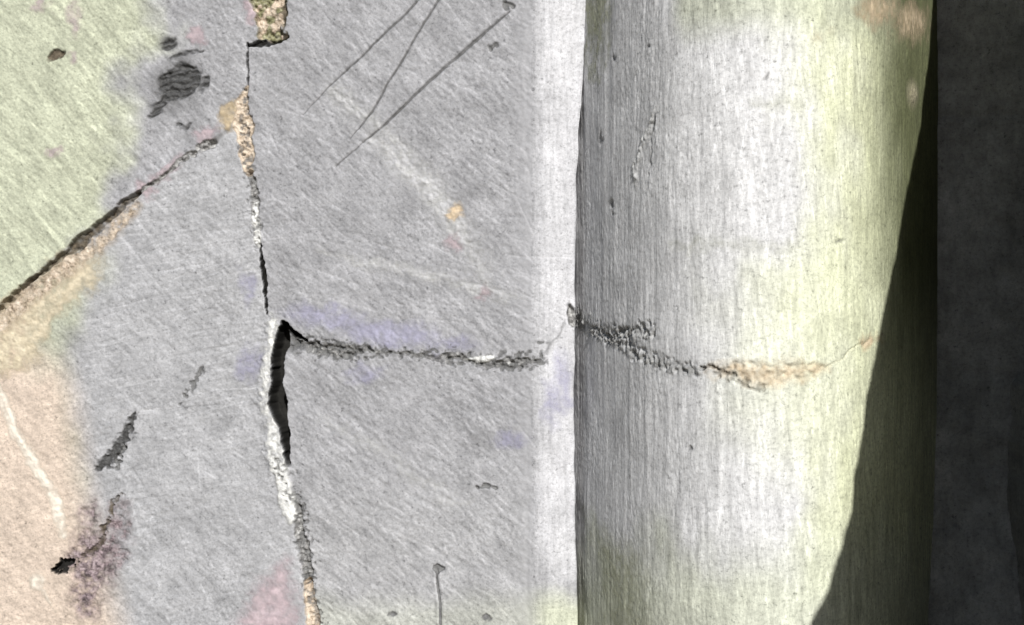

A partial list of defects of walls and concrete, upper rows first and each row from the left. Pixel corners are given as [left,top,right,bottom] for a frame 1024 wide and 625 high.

spalling [250,0,288,48]
spalling [149,39,209,118]
crack [0,44,546,625]
crack [577,318,728,373]
spalling [95,412,136,471]